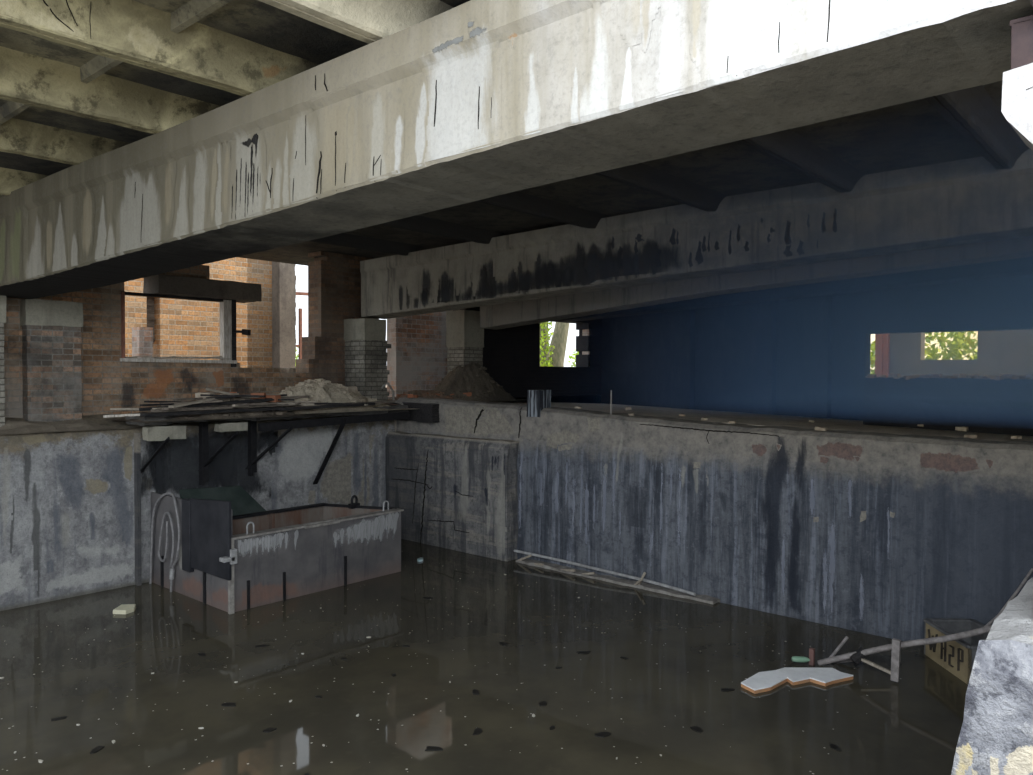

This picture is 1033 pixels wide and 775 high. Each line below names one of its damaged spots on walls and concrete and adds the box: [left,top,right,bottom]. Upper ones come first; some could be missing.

crack [43,0,91,38]
crack [824,0,832,42]
damp [23,11,502,279]
damp [399,241,657,310]
damp [0,436,164,608]
damp [756,431,816,619]
damp [823,526,835,612]
peeling [953,738,1033,775]